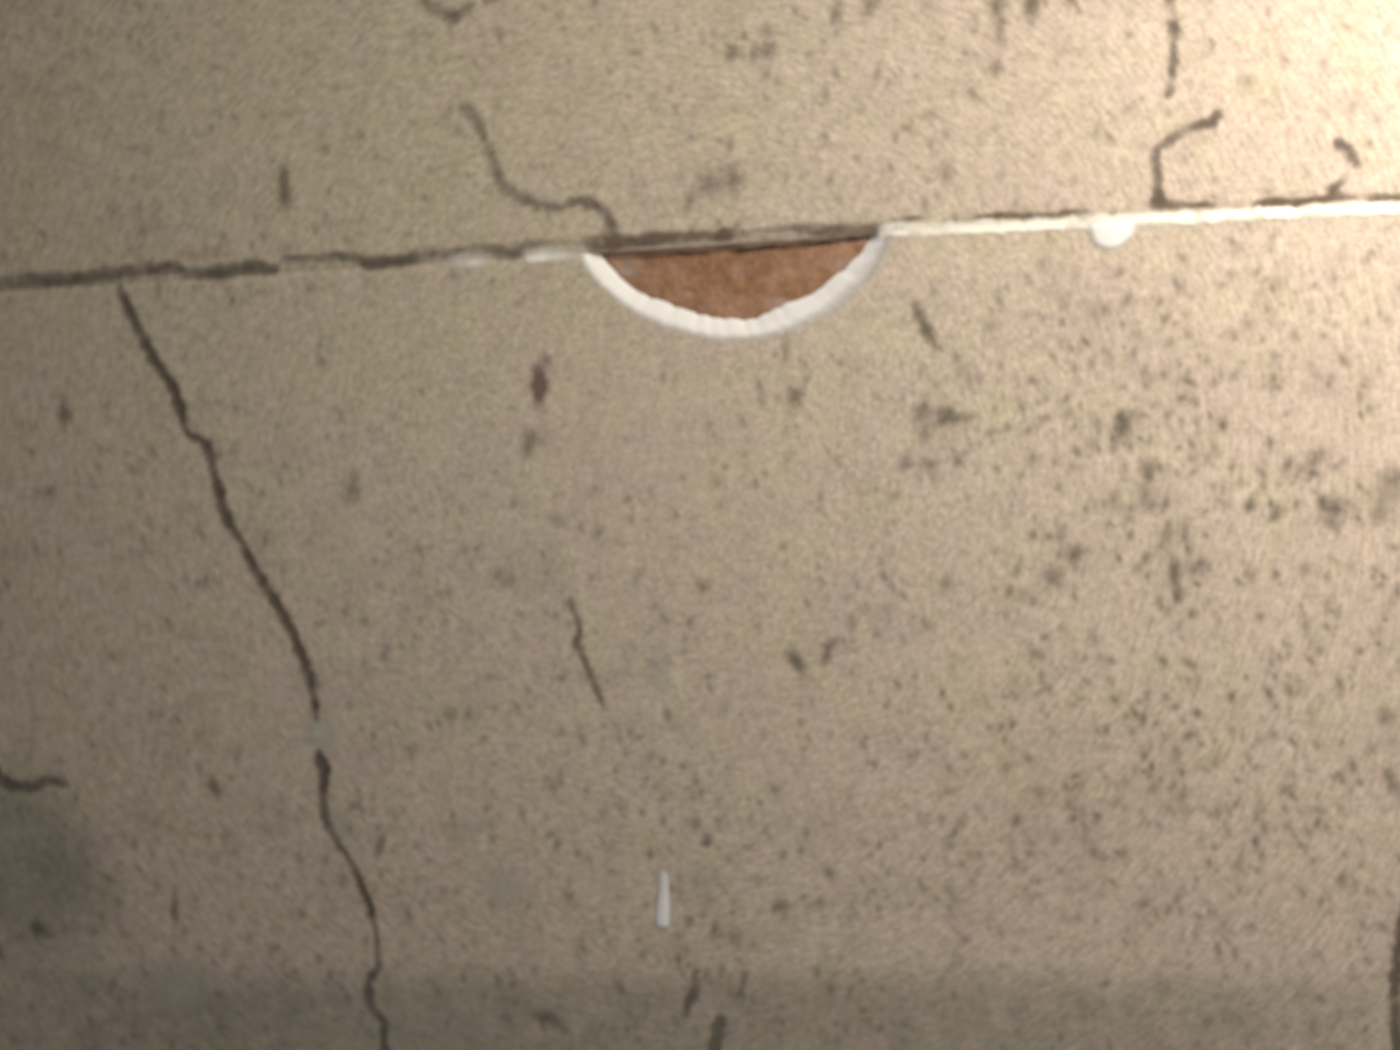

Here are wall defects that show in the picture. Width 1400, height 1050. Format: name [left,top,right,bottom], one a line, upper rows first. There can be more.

crack [1167,21,1179,96]
crack [1153,111,1221,201]
crack [1329,140,1359,192]
crack [530,198,615,227]
spalling [525,201,1400,339]
crack [119,293,319,712]
crack [0,777,62,791]
crack [316,750,388,1050]
crack [1390,917,1400,1050]